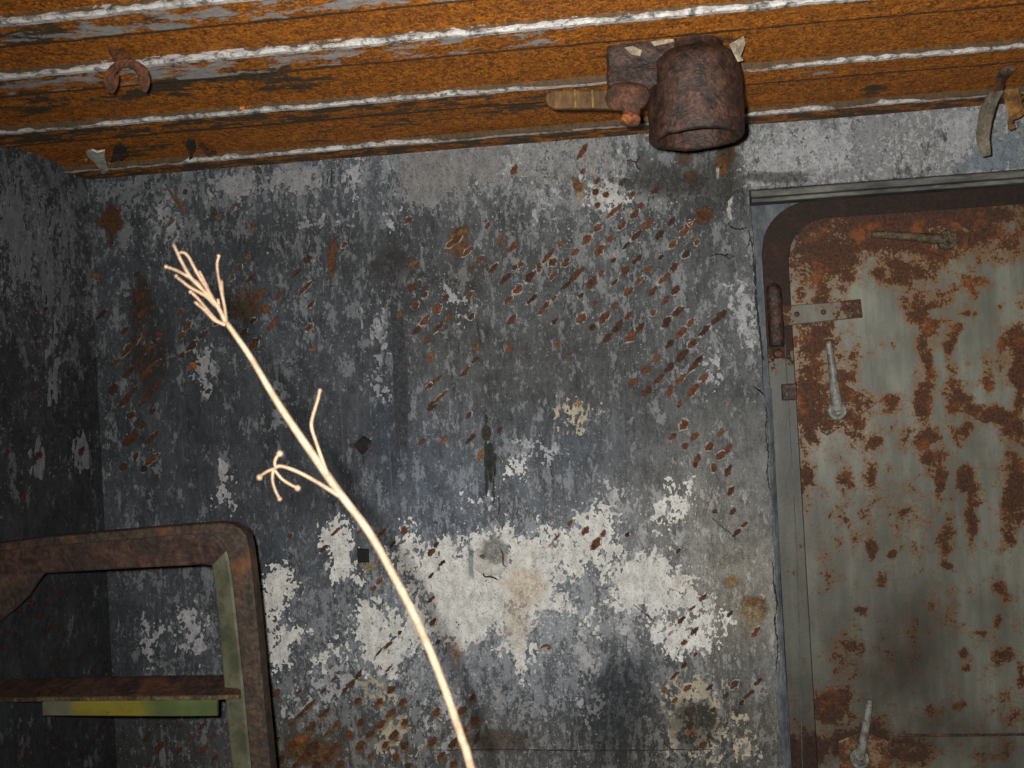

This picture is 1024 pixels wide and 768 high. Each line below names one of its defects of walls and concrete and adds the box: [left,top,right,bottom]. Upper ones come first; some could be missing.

peeling [734,119,862,188]
peeling [926,109,1024,172]
damp [481,414,500,514]